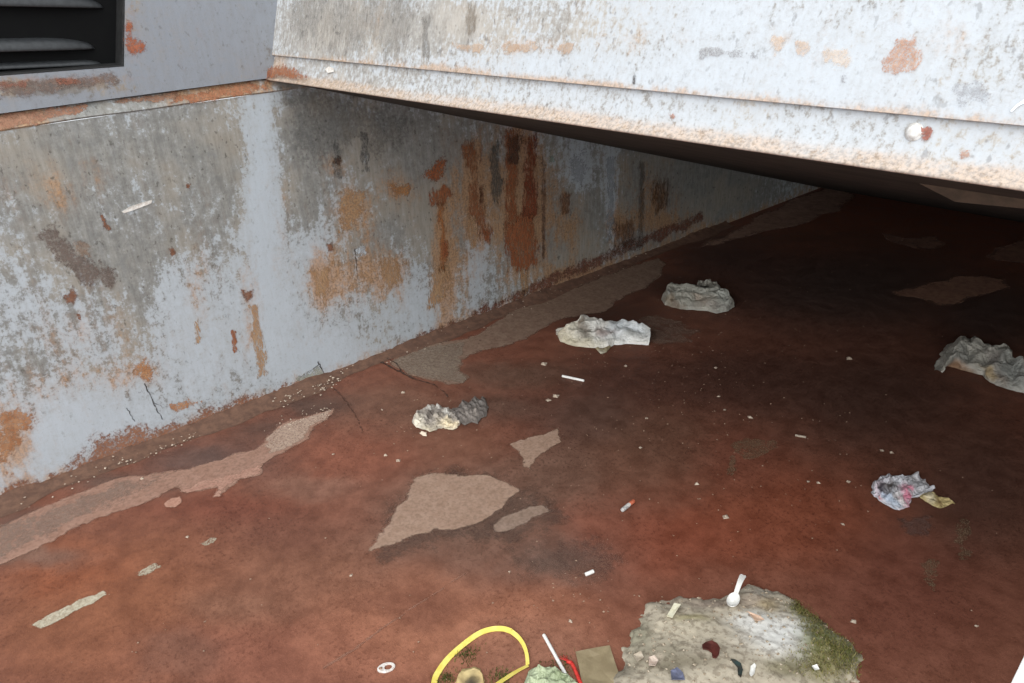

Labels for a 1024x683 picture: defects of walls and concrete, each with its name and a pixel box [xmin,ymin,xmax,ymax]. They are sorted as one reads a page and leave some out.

corrosion [881,39,921,74]
corrosion [0,73,118,97]
corrosion [115,64,307,103]
corrosion [0,103,87,130]
corrosion [417,129,703,337]
corrosion [248,305,267,378]
crack [380,358,448,397]
corrosion [0,382,287,494]